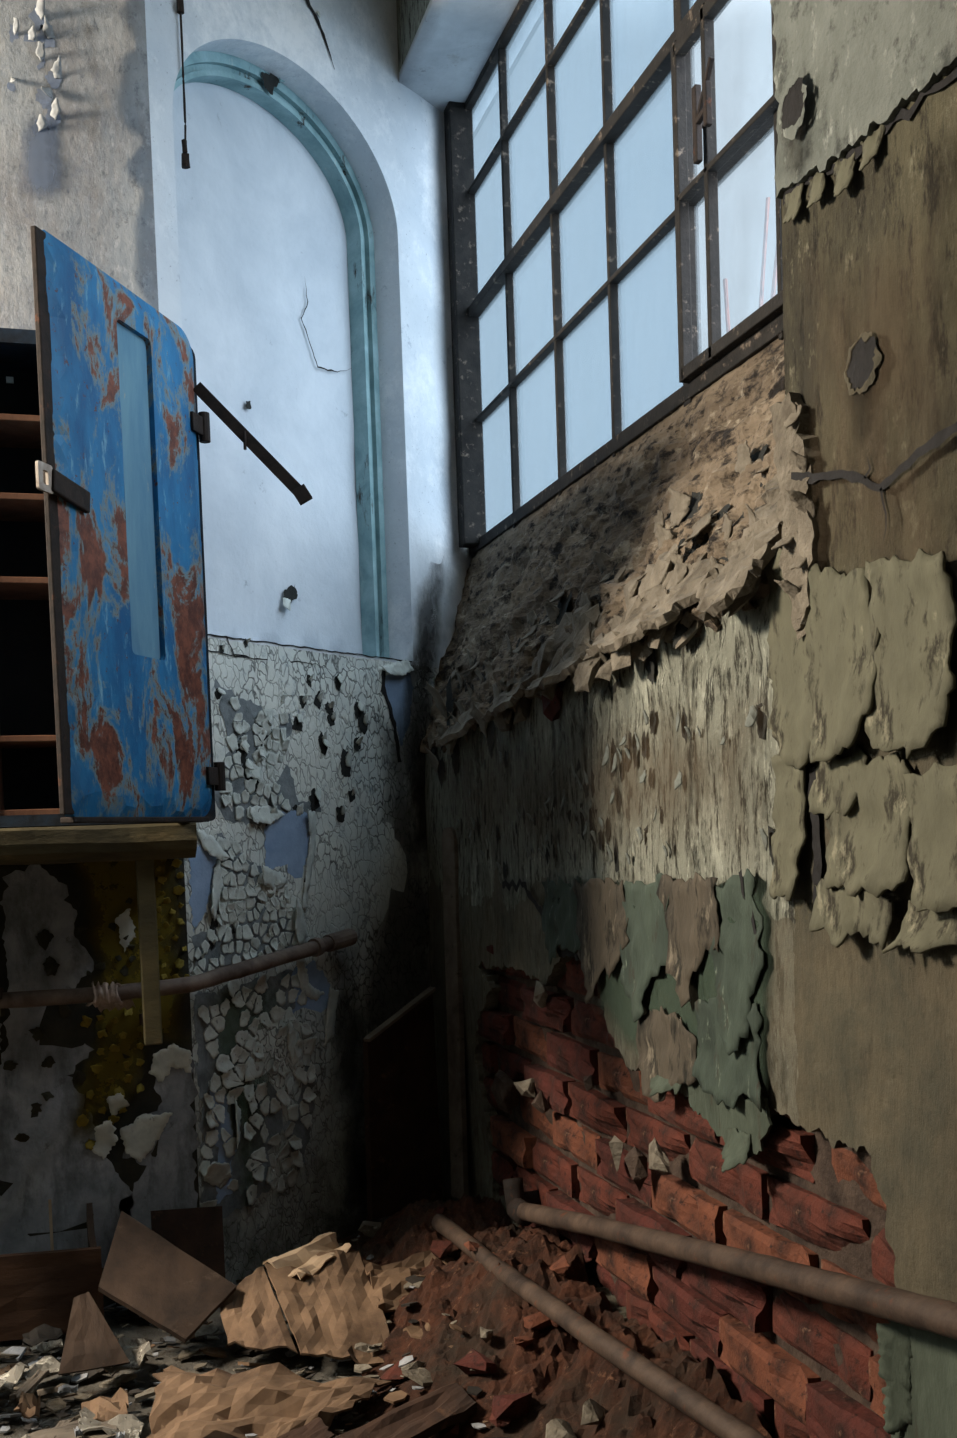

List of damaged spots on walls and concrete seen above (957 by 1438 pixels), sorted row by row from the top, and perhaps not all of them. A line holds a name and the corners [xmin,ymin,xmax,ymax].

crack [305,0,334,67]
flaking render [770,0,957,224]
flaking render [283,585,298,610]
peeling [381,392,957,1287]
peeling [0,674,370,1268]
flaking render [524,1223,957,1438]